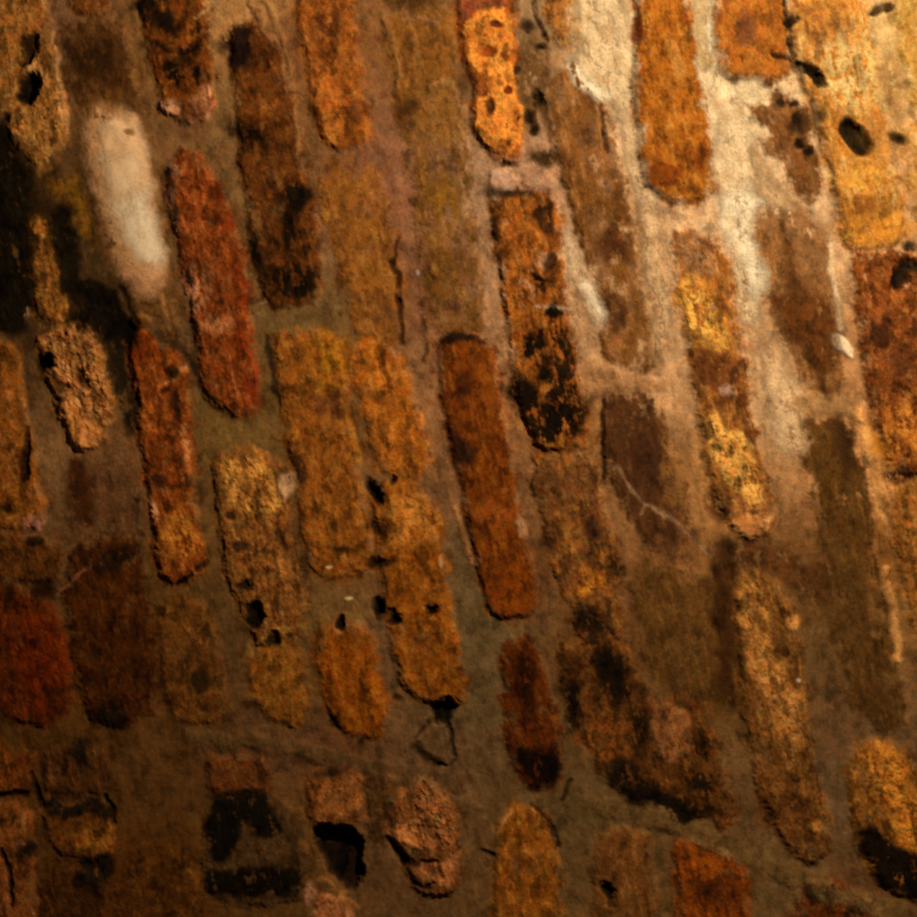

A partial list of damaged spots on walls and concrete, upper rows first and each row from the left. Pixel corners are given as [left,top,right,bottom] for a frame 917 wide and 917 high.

efflorescence [83,107,166,294]
efflorescence [565,0,671,350]
efflorescence [693,0,796,328]
spalling [38,329,109,449]
efflorescence [762,343,805,454]
water stain [773,224,854,394]
hole [314,824,364,889]
spalling [391,787,456,888]